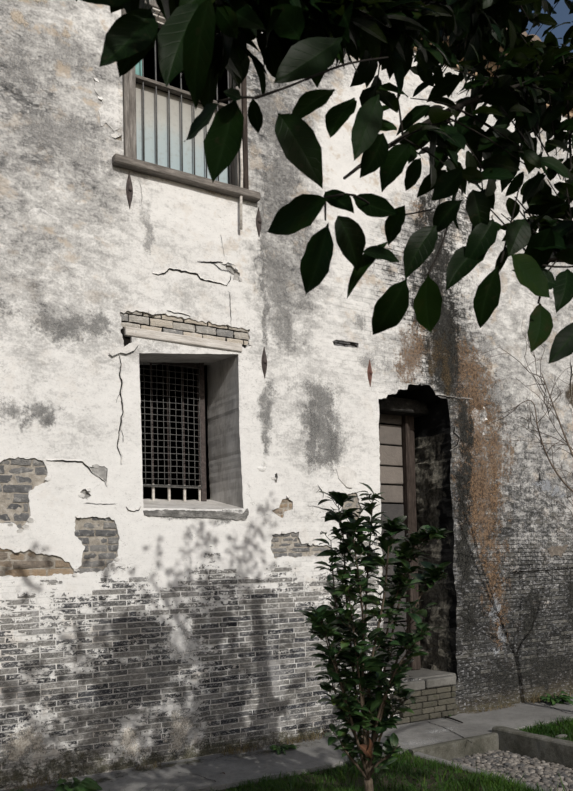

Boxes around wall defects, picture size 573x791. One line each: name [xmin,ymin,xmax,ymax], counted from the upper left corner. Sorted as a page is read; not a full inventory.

crack [153,237,236,326]
leakage [30,312,111,341]
crack [46,353,125,504]
leakage [302,380,343,467]
leakage [409,192,485,661]
flaking render [0,457,51,533]
flaking render [273,496,292,518]
peeling [0,515,380,789]
leakage [469,560,573,699]